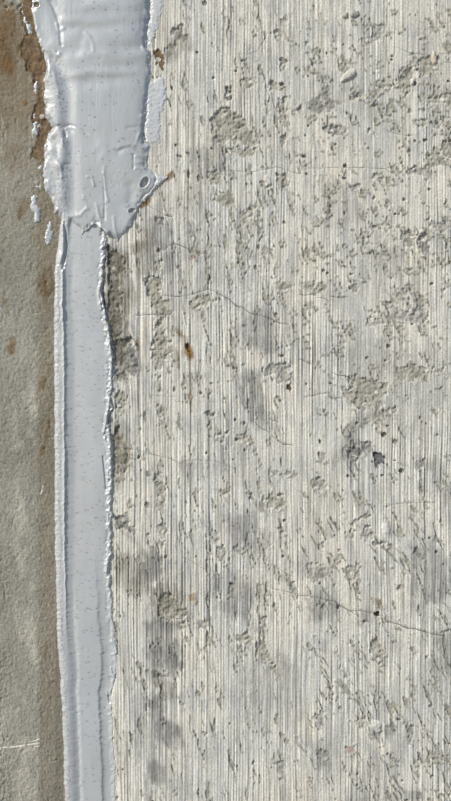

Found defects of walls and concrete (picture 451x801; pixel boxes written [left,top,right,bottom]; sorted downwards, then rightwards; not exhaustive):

crack [136,205,290,338]
crack [260,564,451,639]